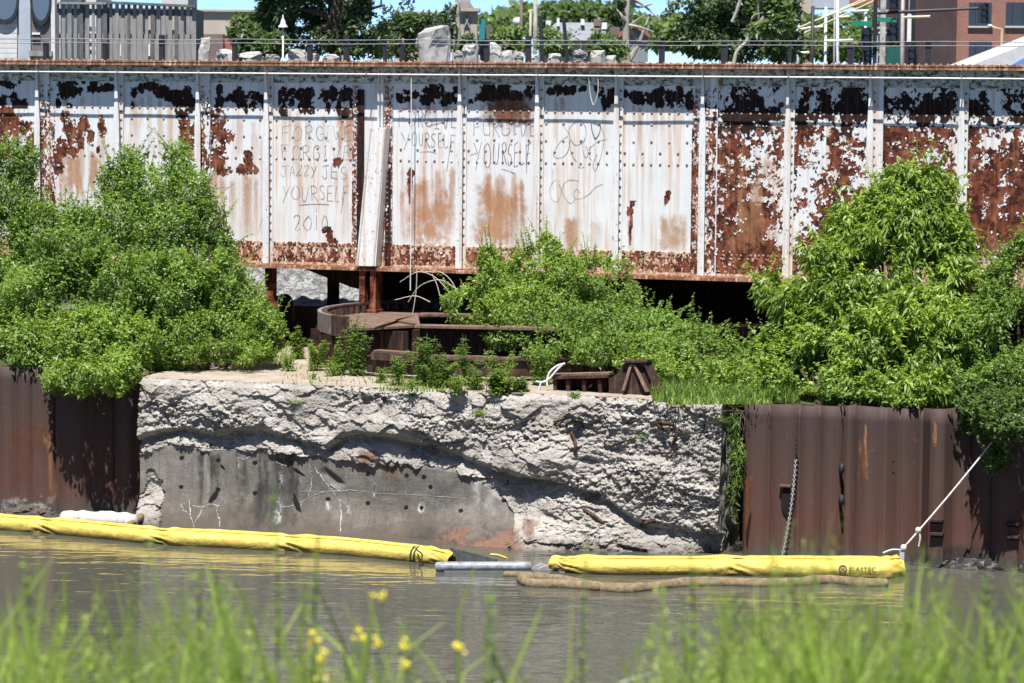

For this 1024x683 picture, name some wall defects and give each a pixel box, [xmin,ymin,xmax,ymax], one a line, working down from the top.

rust [0,87,107,203]
peeling [130,82,196,119]
rust [177,91,259,219]
rust [229,91,358,263]
peeling [278,84,353,119]
peeling [396,84,694,111]
rust [563,88,867,276]
peeling [718,86,869,143]
rust [882,126,1024,261]
peeling [883,88,1024,140]
crack [145,445,383,531]
spalling [135,377,725,555]